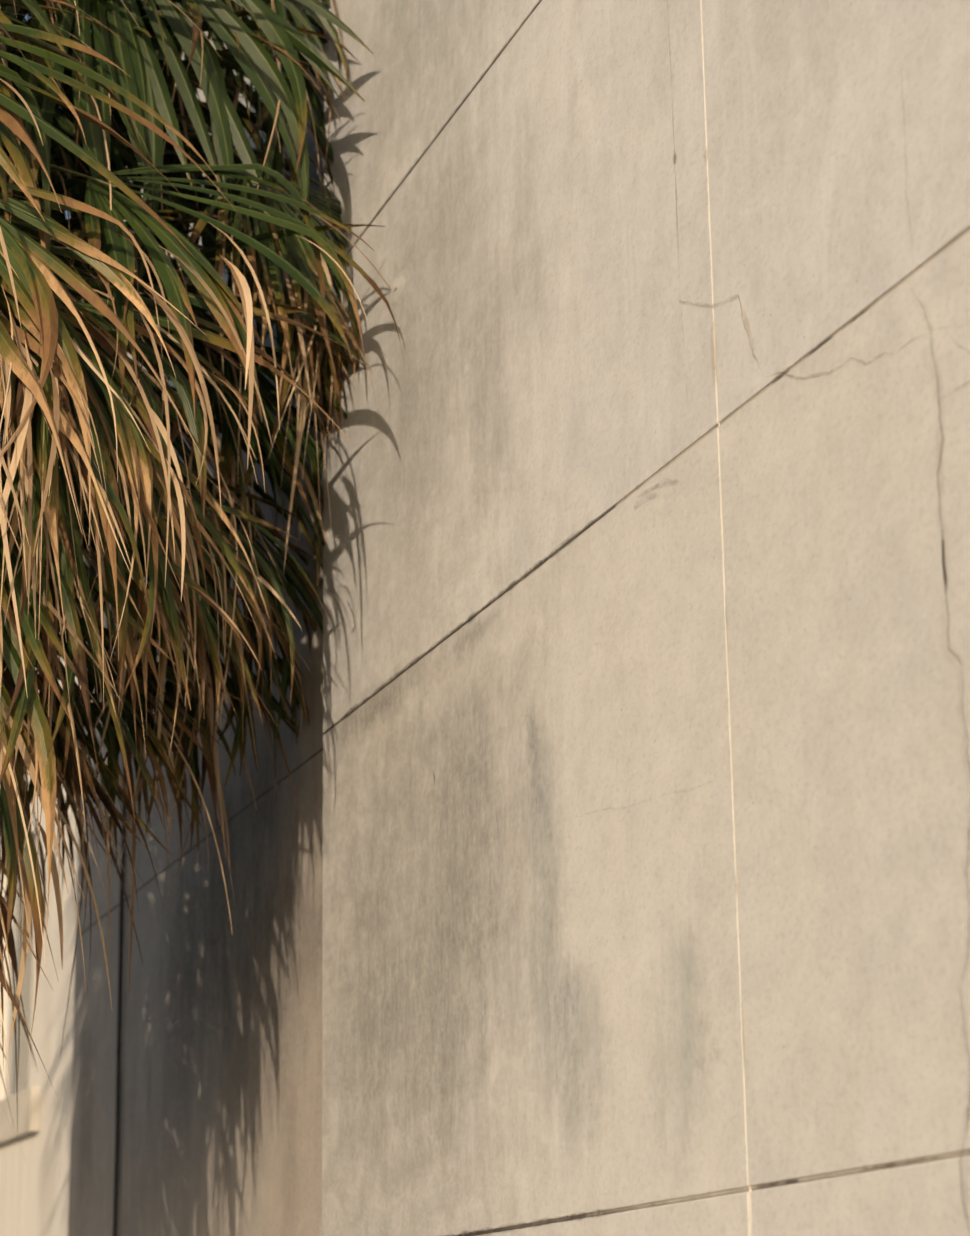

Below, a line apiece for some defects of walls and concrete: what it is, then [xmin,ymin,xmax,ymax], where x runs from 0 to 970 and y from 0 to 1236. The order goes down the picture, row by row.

crack [940,539,948,588]